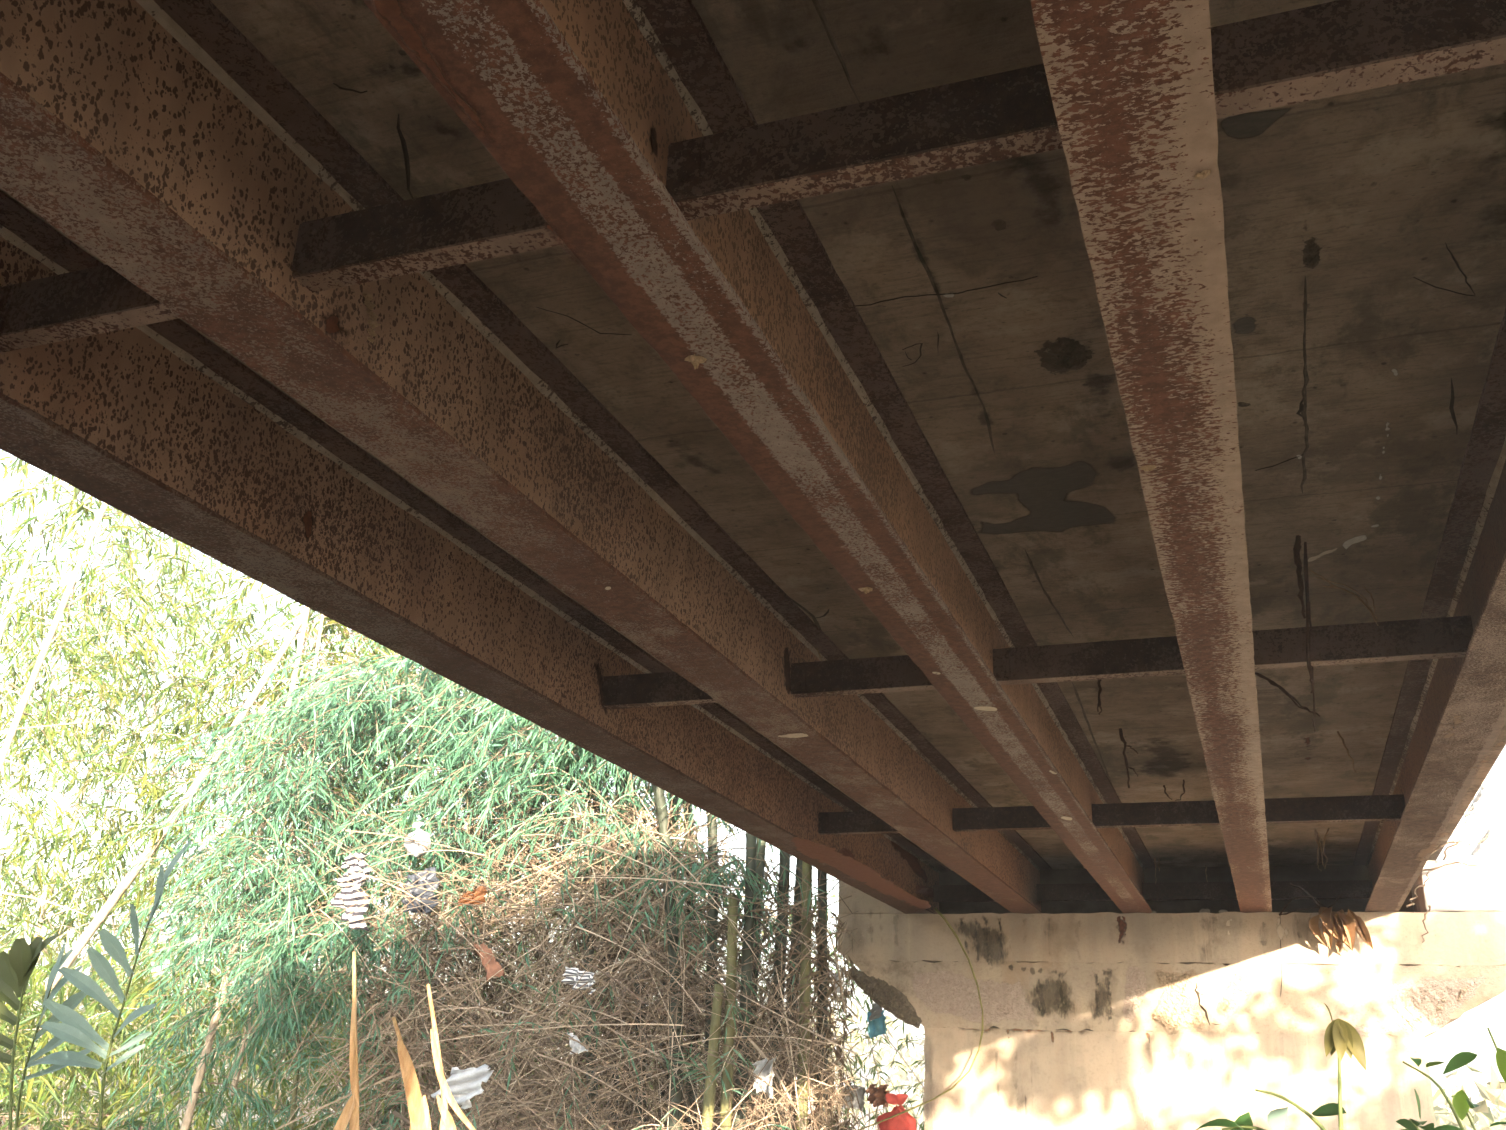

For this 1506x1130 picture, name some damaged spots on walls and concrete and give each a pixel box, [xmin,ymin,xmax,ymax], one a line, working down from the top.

crack [855,276,1038,306]
crack [1413,243,1475,296]
crack [1255,276,1309,493]
leakage [971,459,1132,534]
spalling [1123,966,1208,1035]
spalling [1355,976,1487,1038]